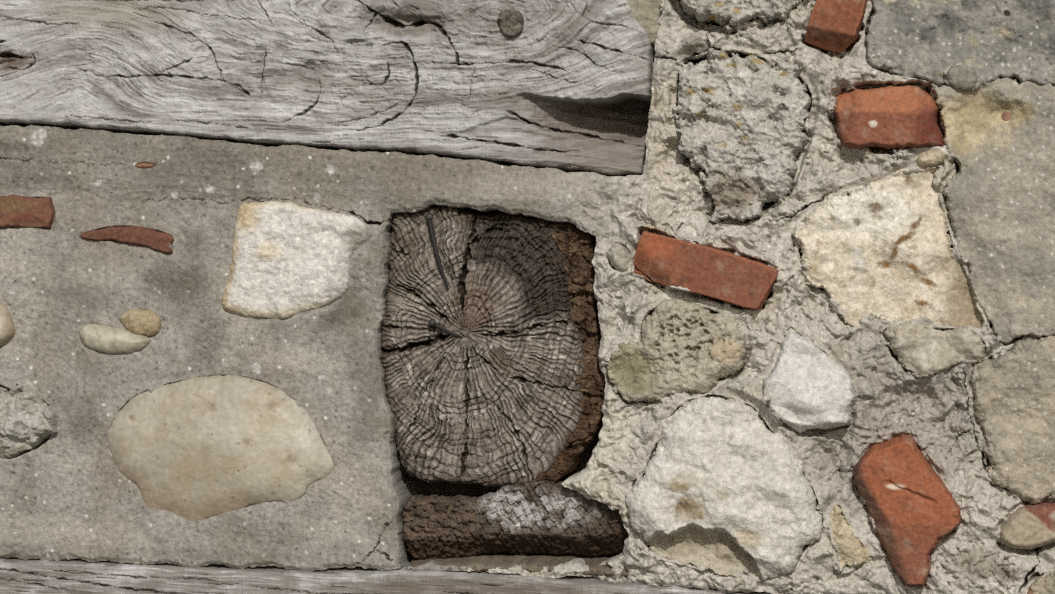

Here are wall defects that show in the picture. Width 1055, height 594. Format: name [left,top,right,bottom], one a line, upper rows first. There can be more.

crack [1020,548,1043,589]